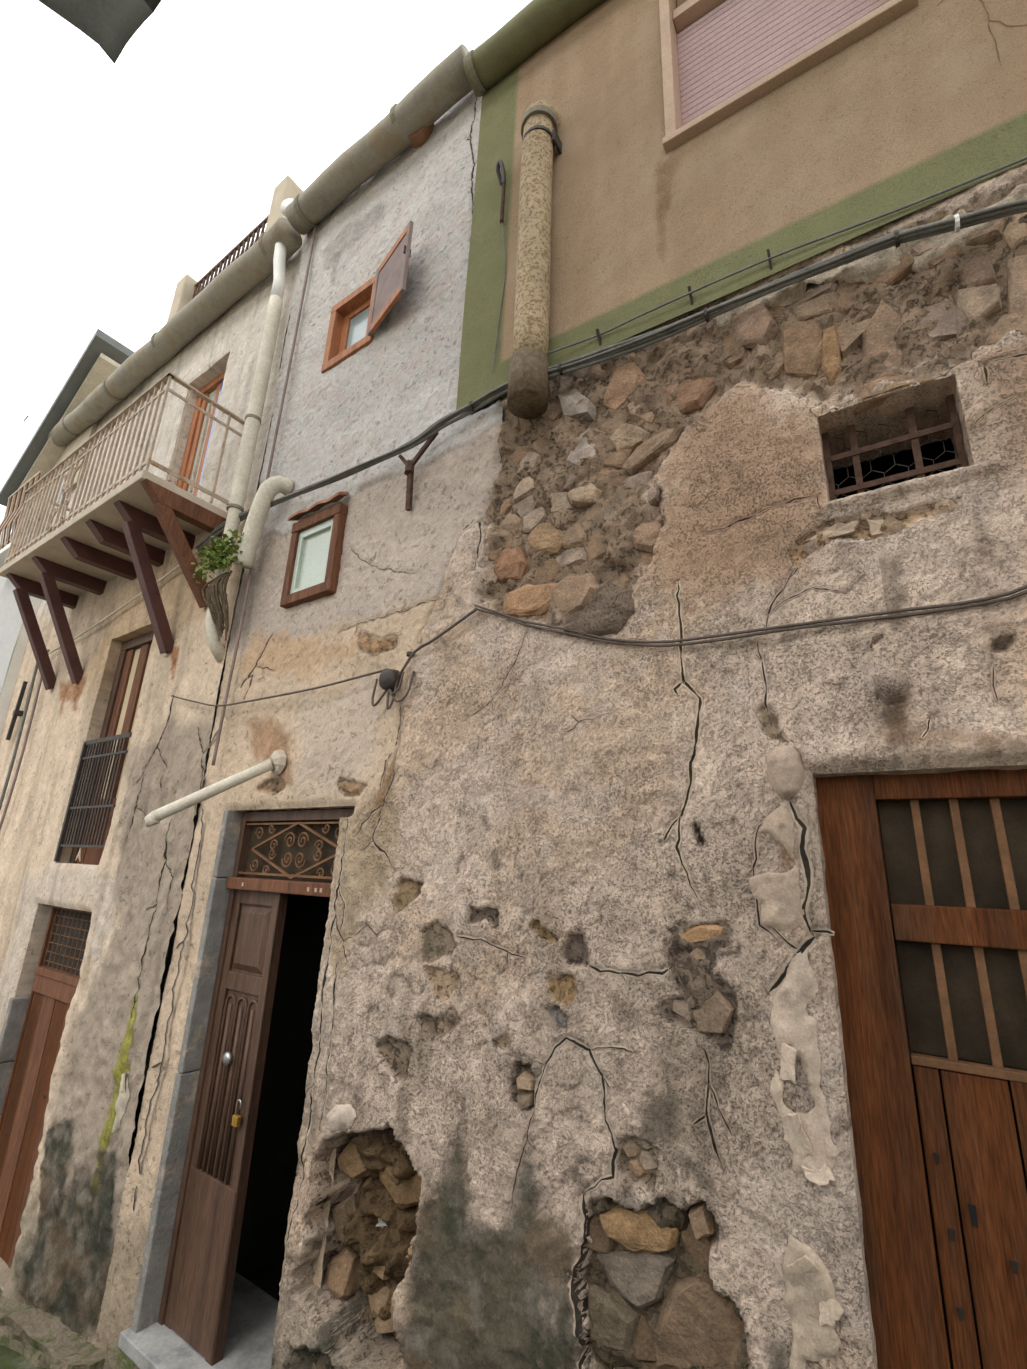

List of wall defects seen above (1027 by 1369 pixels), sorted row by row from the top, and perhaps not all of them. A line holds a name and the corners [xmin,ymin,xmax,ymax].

spalling [474,174,1027,631]
crack [663,581,703,901]
crack [754,567,847,715]
crack [125,695,218,1242]
spalling [376,906,500,1082]
crack [748,800,835,995]
peeling [770,951,838,1185]
damp [17,1120,115,1334]
spalling [283,1127,422,1369]
damp [400,1148,584,1369]
crack [508,1035,634,1369]
spalling [576,1136,752,1369]